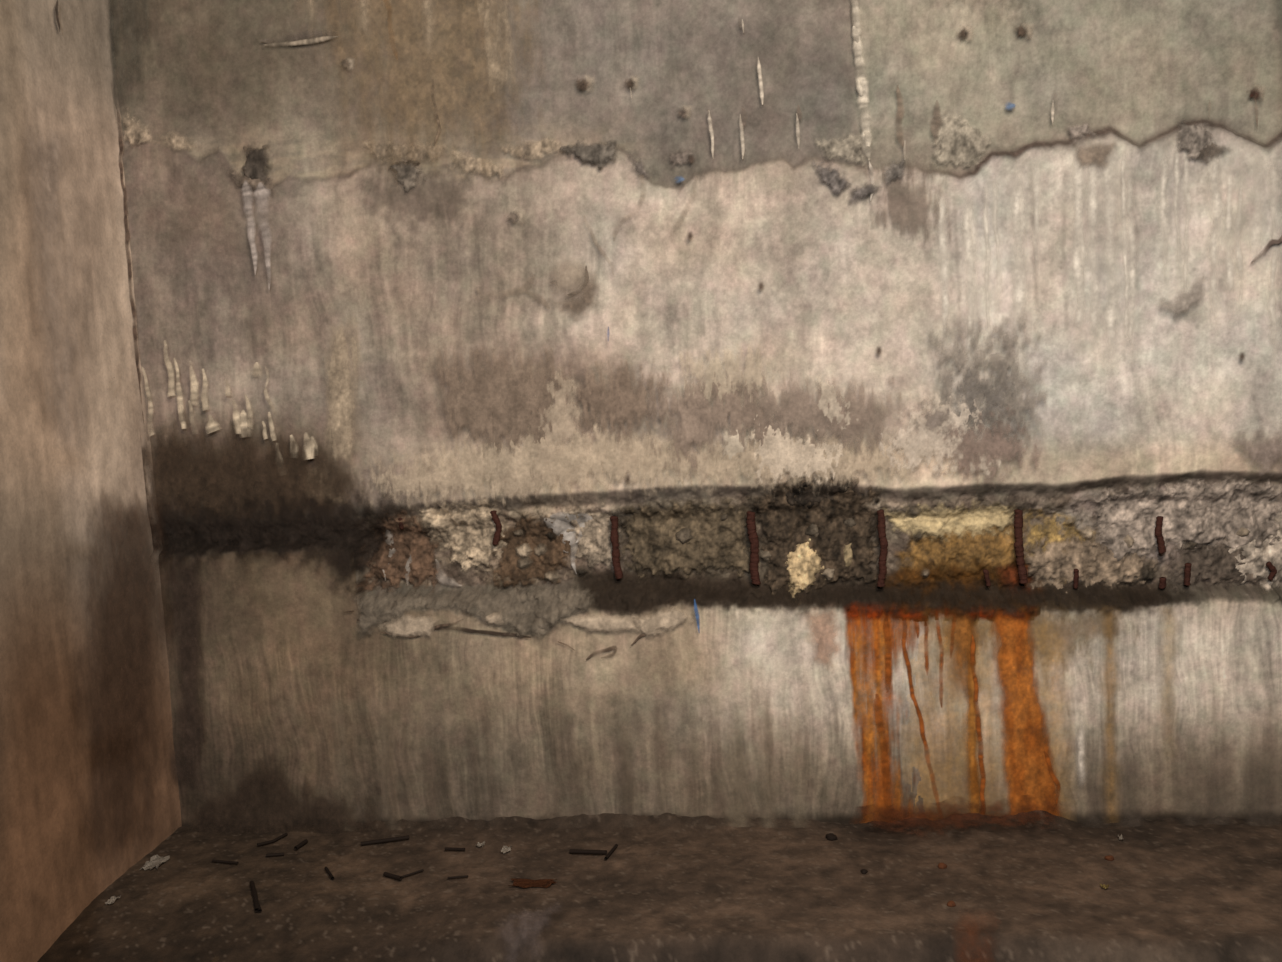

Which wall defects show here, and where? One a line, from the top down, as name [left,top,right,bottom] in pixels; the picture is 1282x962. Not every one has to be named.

leakage [91,329,374,847]
leakage [382,530,412,575]
flaking render [382,616,436,637]
flaking render [487,612,503,624]
flaking render [562,609,687,636]
leakage [437,349,901,476]
spalling [356,349,1282,596]
corrosion [847,519,1087,823]
leakage [889,168,1046,482]
leakage [1073,145,1135,346]
leakage [1159,149,1277,339]